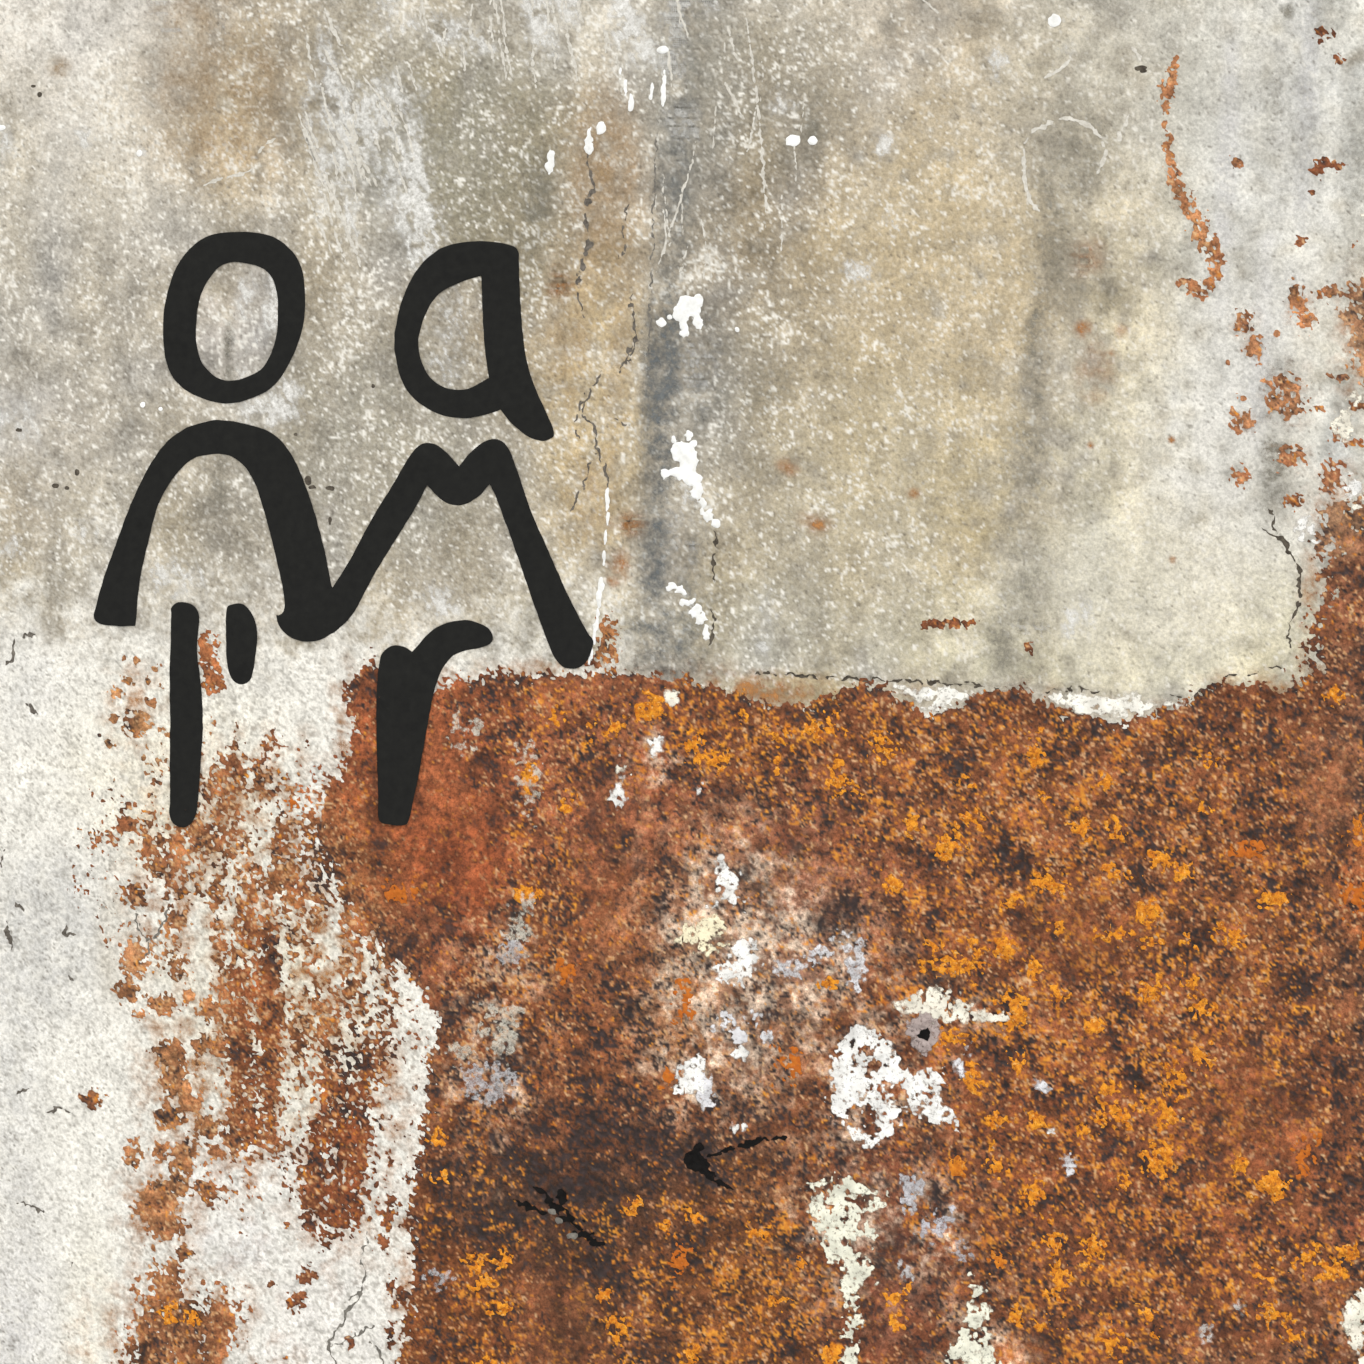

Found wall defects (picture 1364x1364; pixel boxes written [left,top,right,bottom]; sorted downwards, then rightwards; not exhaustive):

corrosion [1312,26,1347,65]
corrosion [1157,55,1227,302]
corrosion [1229,155,1244,169]
corrosion [1308,156,1346,196]
crack [570,119,659,511]
corrosion [1283,277,1364,411]
crack [1170,509,1303,700]
crack [755,671,999,690]
crack [1045,686,1100,694]
corrosion [66,308,1364,1364]